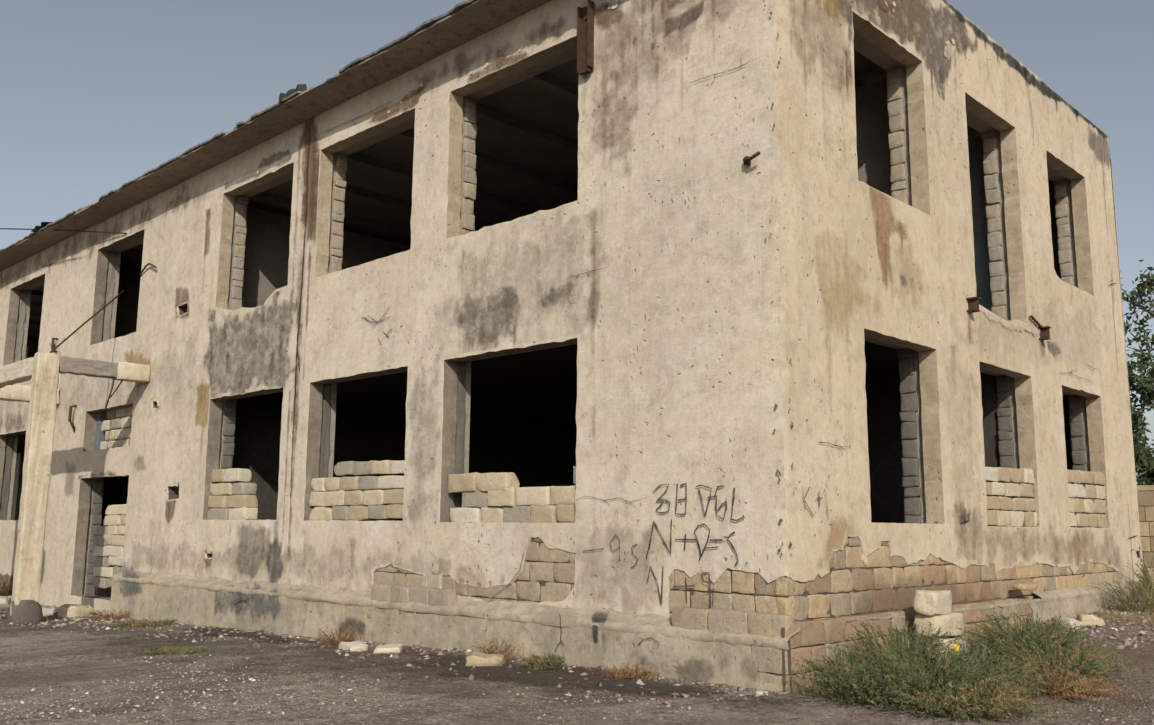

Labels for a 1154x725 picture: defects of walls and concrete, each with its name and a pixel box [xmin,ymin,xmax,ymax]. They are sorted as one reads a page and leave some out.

leakage [817,0,977,90]
leakage [299,117,319,239]
leakage [1090,131,1110,163]
rust [870,187,906,281]
leakage [195,286,308,425]
leakage [215,541,283,618]
spalling [367,537,576,627]
spalling [654,537,1122,692]